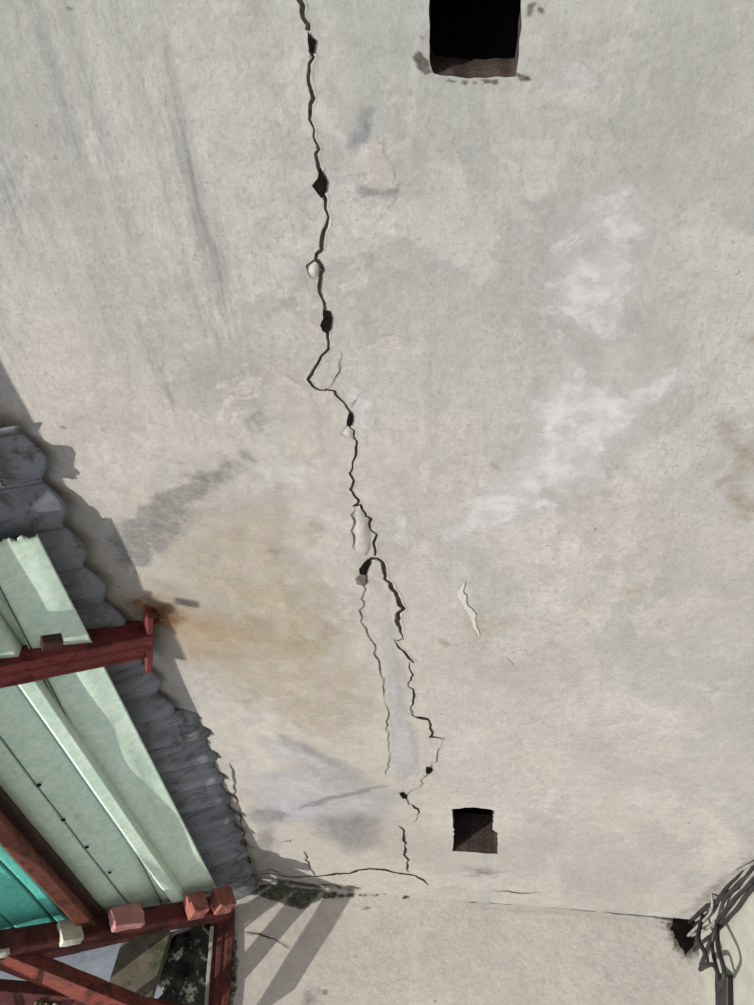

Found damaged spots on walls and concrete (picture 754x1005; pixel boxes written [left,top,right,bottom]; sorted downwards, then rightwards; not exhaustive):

spalling [413,0,542,74]
crack [229,0,445,885]
mould [253,879,377,909]